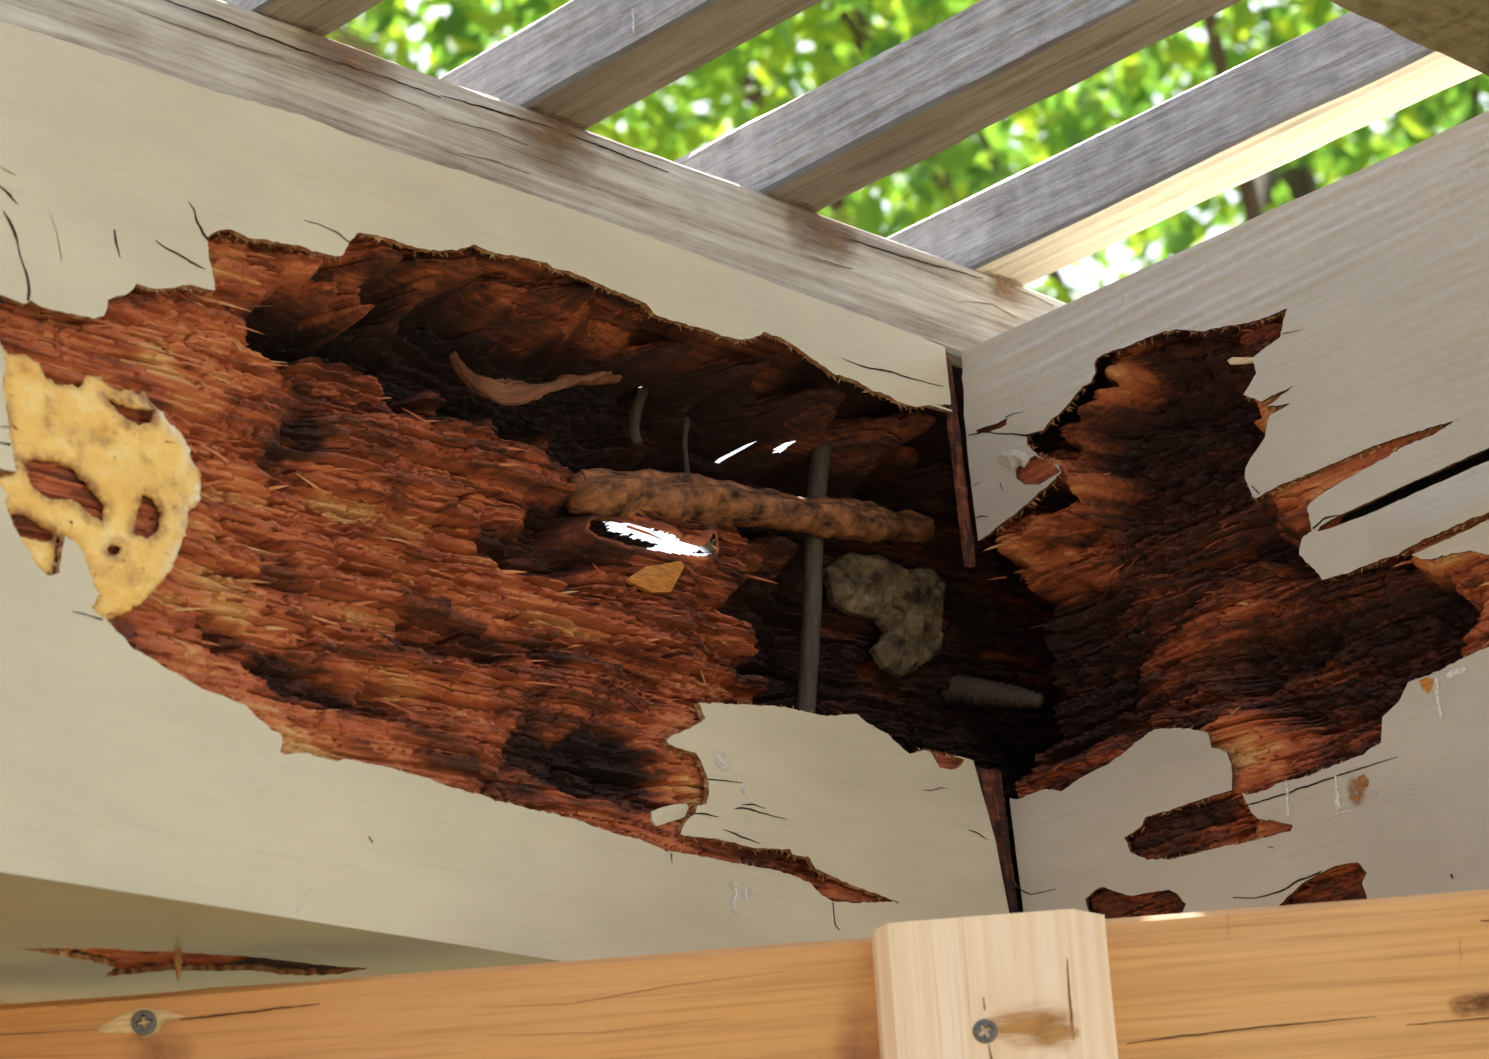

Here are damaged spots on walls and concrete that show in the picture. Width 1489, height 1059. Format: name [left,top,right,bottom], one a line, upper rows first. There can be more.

crack [0,166,62,304]
crack [155,201,209,269]
crack [304,220,350,243]
crack [1313,514,1344,529]
spalling [0,230,1489,913]
peeling [1088,888,1186,919]